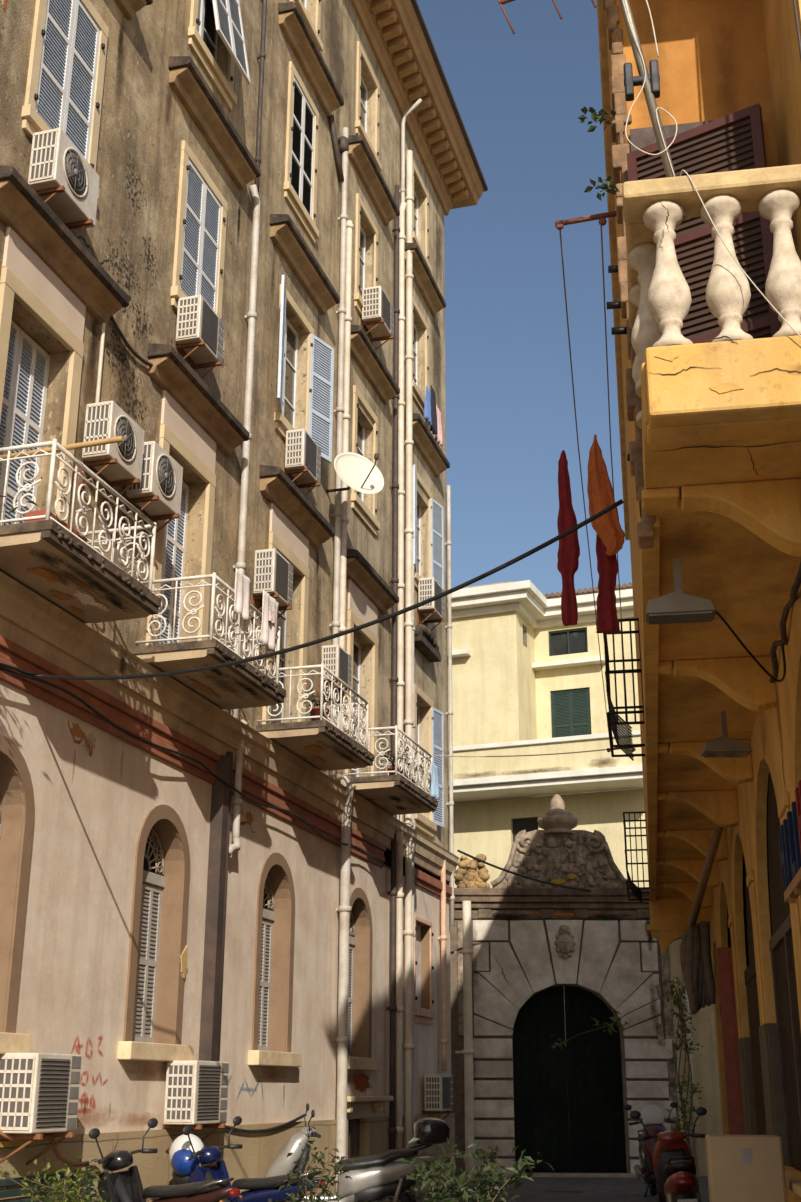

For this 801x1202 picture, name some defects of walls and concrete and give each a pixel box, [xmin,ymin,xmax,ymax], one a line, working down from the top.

crack [649,336,738,375]
crack [657,441,800,476]